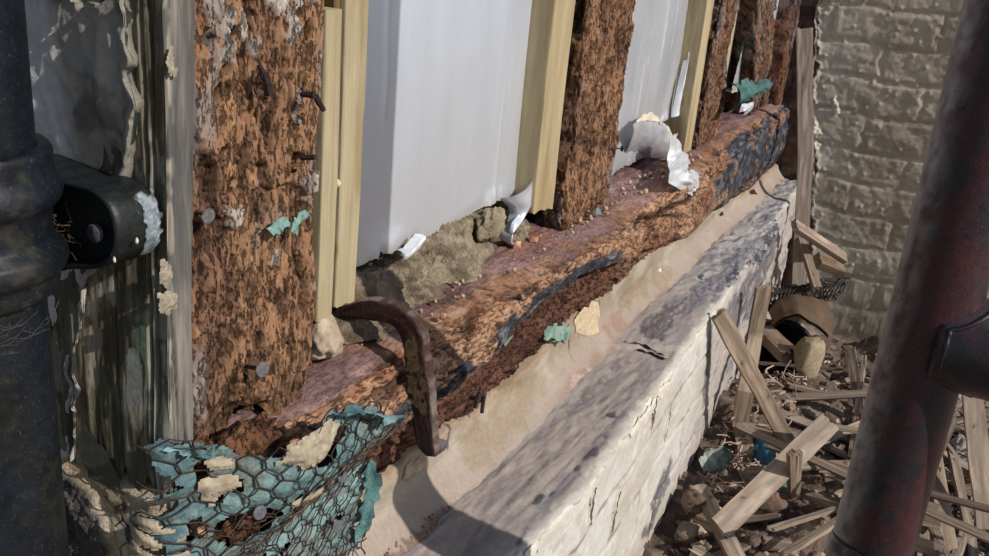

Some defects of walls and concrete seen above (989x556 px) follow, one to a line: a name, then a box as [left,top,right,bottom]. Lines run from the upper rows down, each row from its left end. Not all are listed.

peeling [119,0,140,165]
crack [624,341,666,359]